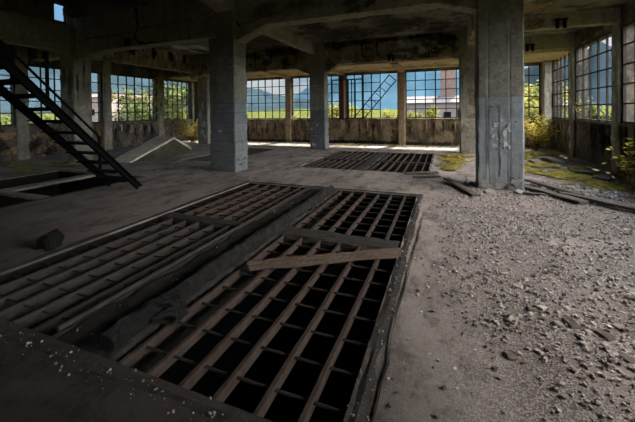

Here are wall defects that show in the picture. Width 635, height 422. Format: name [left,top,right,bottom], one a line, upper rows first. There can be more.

water stain [298,0,457,55]
peeling [492,118,517,153]